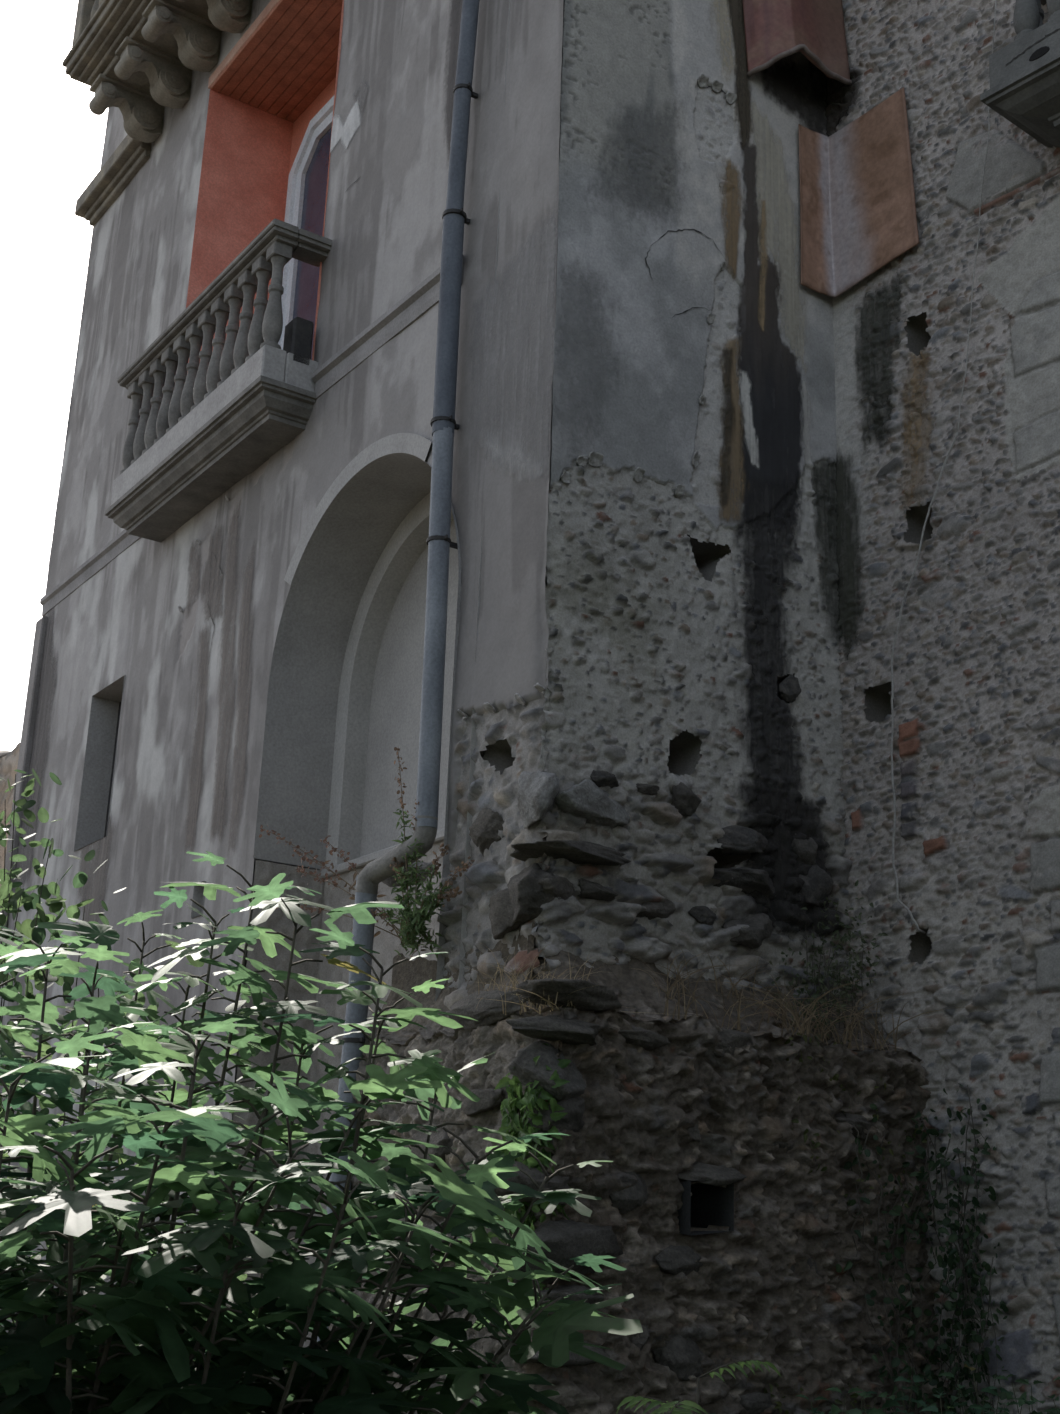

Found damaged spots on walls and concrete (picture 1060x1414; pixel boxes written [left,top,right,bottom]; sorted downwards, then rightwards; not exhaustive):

crack [645,229,722,280]
damp [855,278,901,445]
damp [714,0,864,938]
spalling [436,261,859,1010]
spalling [861,682,899,723]